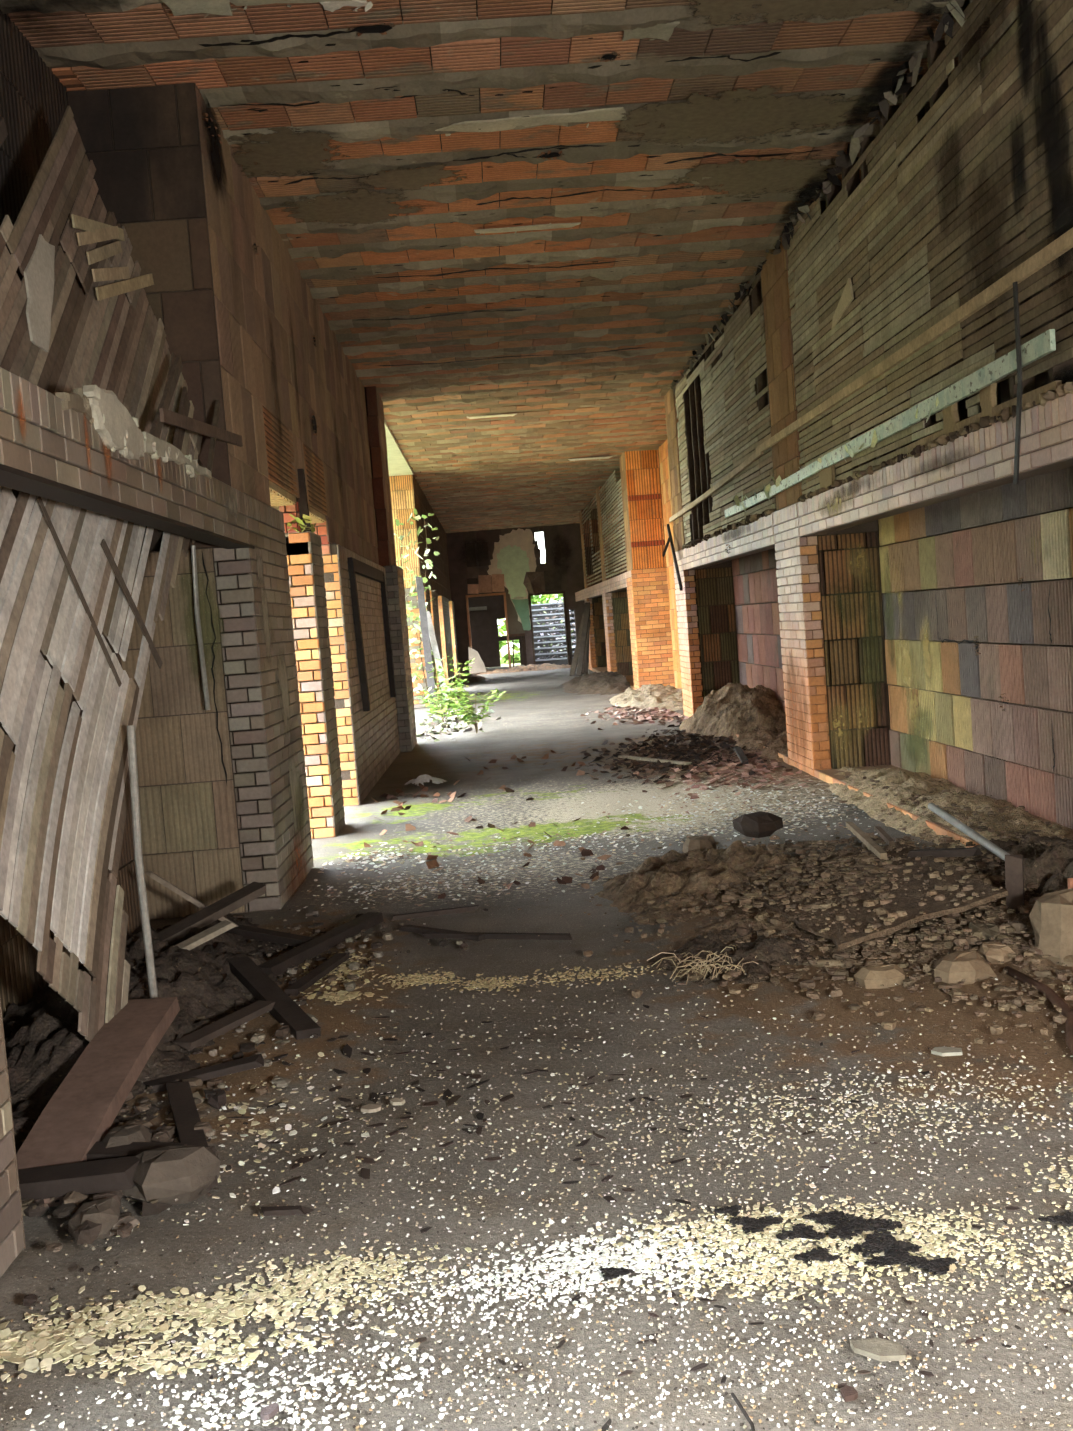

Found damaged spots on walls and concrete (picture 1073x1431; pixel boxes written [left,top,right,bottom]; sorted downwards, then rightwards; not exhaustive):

peeling [320,0,373,12]
peeling [589,21,680,69]
damp [969,0,1073,288]
spalling [55,385,212,479]
peeling [487,528,537,631]